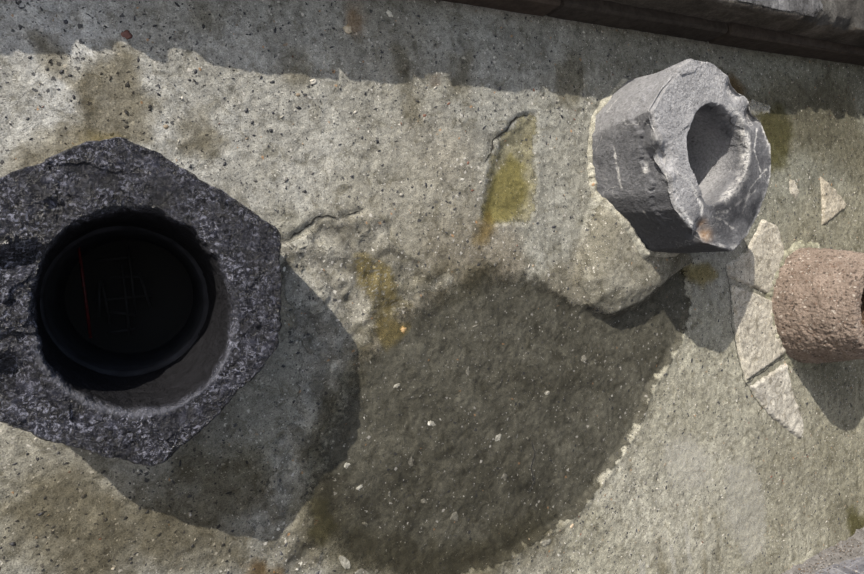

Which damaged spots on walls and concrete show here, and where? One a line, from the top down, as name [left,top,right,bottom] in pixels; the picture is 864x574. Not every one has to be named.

crack [283,211,359,254]
damp [665,439,711,491]